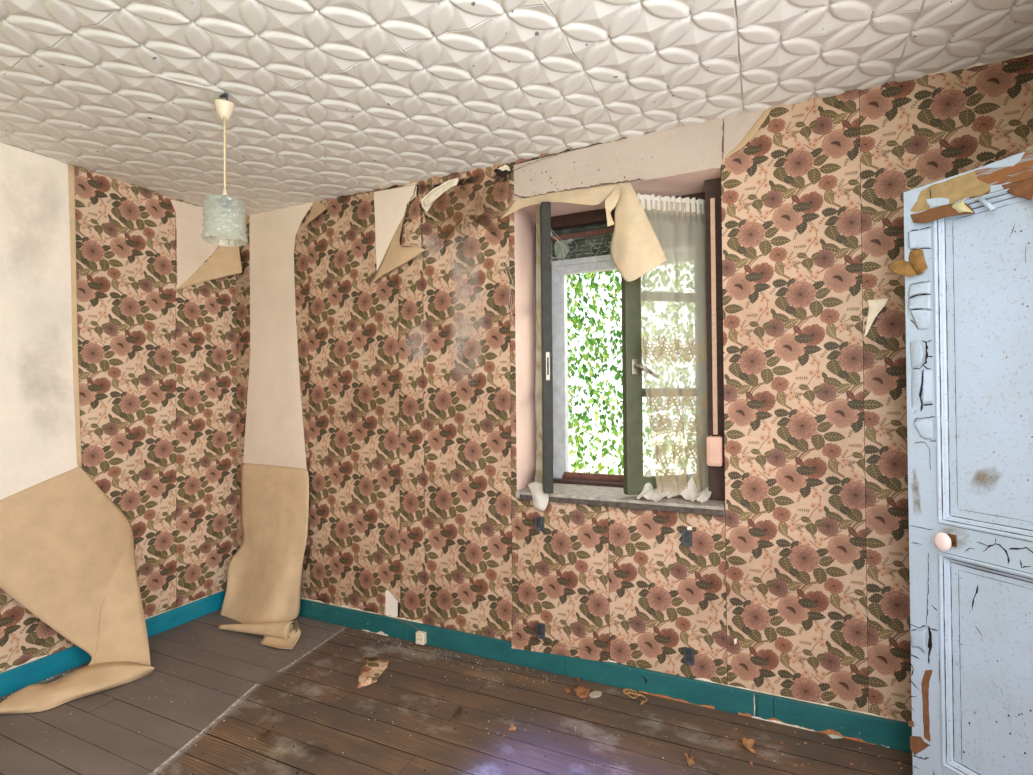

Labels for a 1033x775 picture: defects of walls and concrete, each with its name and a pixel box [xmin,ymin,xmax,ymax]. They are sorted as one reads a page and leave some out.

peeling [1001,177,1033,201]
peeling [910,197,996,223]
peeling [554,238,580,259]
crack [965,538,1033,568]